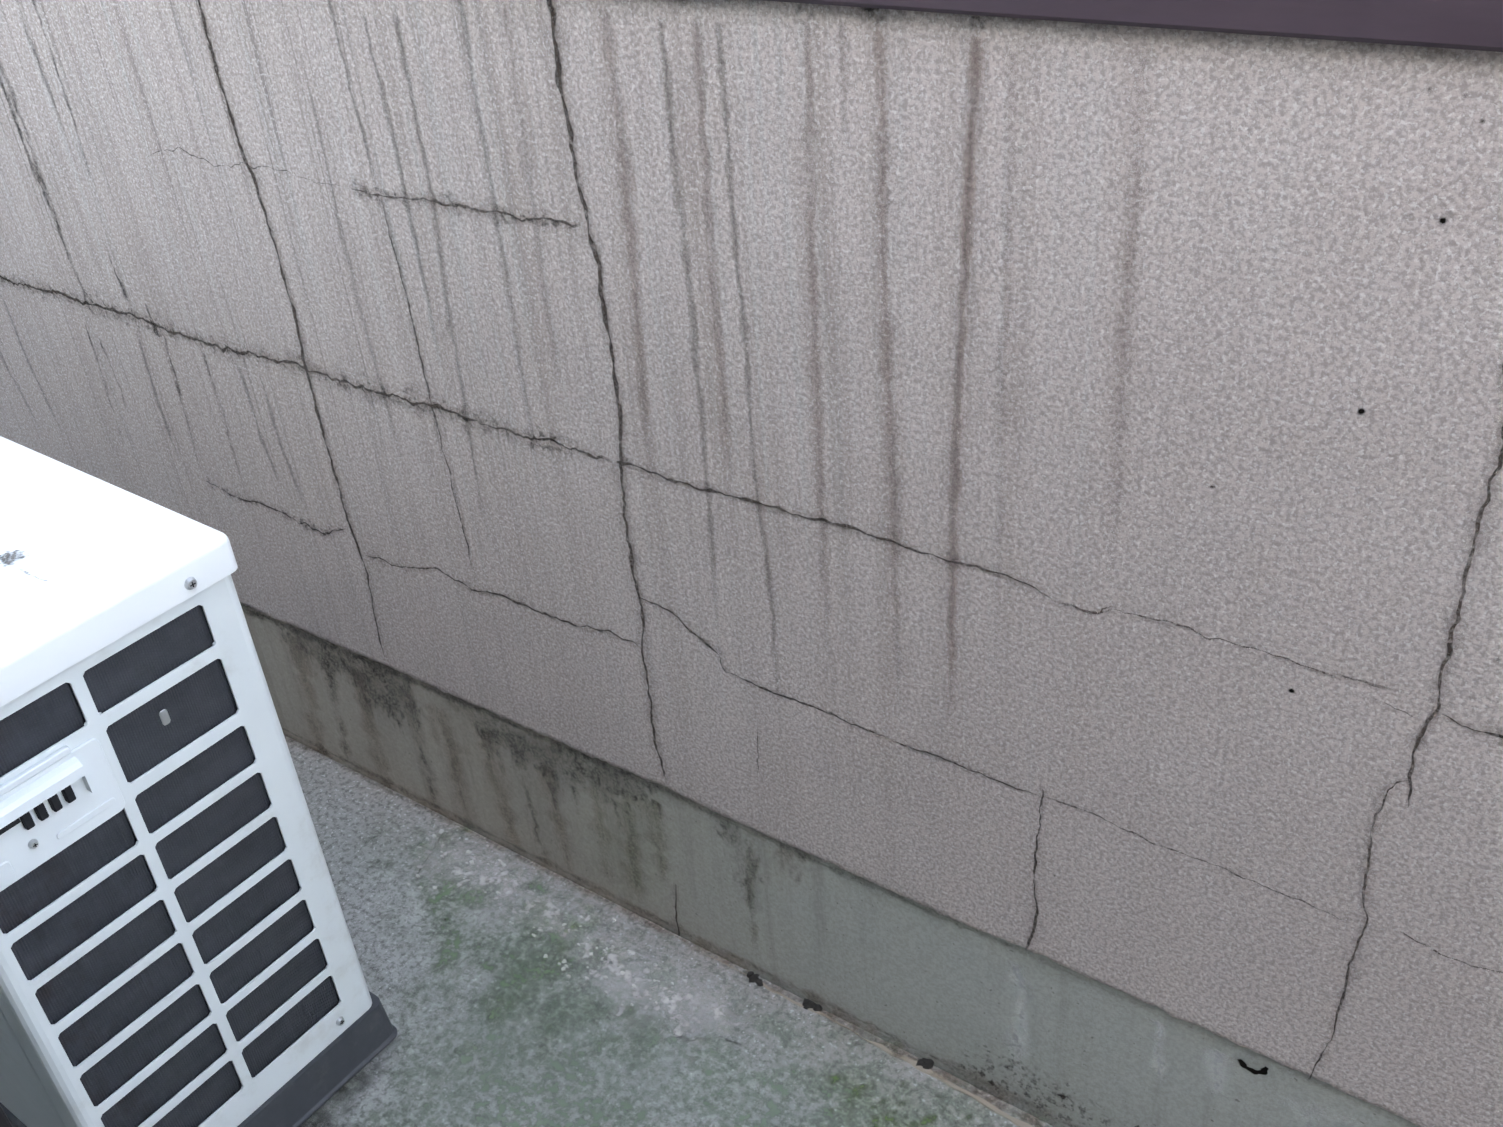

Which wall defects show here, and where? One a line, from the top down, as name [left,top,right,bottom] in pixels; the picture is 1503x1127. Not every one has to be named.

leakage [0,67,68,254]
crack [0,0,1380,948]
leakage [241,604,651,887]
crack [1310,426,1503,1077]
leakage [961,1051,1107,1124]